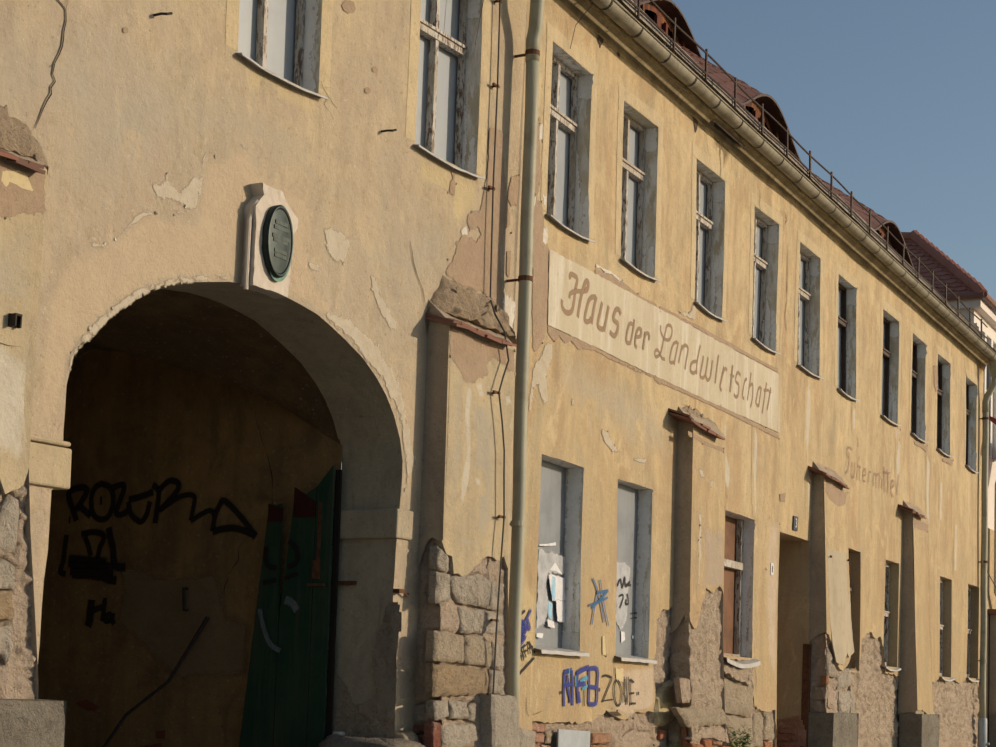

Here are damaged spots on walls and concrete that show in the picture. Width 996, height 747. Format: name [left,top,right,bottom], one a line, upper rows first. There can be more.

flaking render [0,157,46,220]
crack [35,0,68,128]
flaking render [31,122,425,511]
flaking render [440,94,520,329]
flaking render [450,326,516,383]
peeling [577,74,594,122]
flaking render [528,117,779,440]
spalling [0,481,36,699]
spalling [324,602,402,739]
spalling [413,538,506,747]
spalling [532,468,979,747]